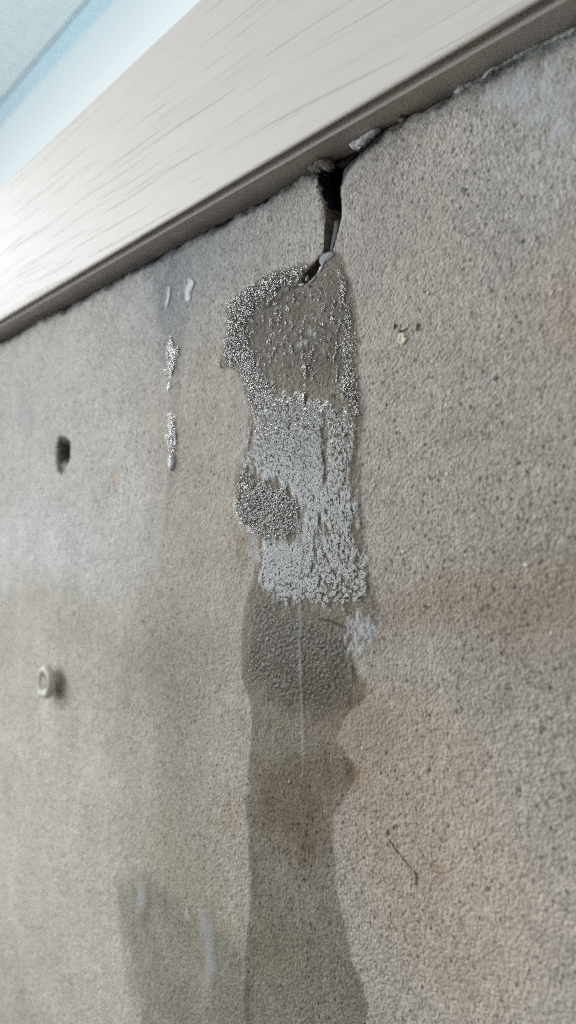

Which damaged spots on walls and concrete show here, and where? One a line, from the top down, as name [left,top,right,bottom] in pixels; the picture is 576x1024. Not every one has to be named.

crack [263,154,359,309]
efflorescence [348,612,375,651]